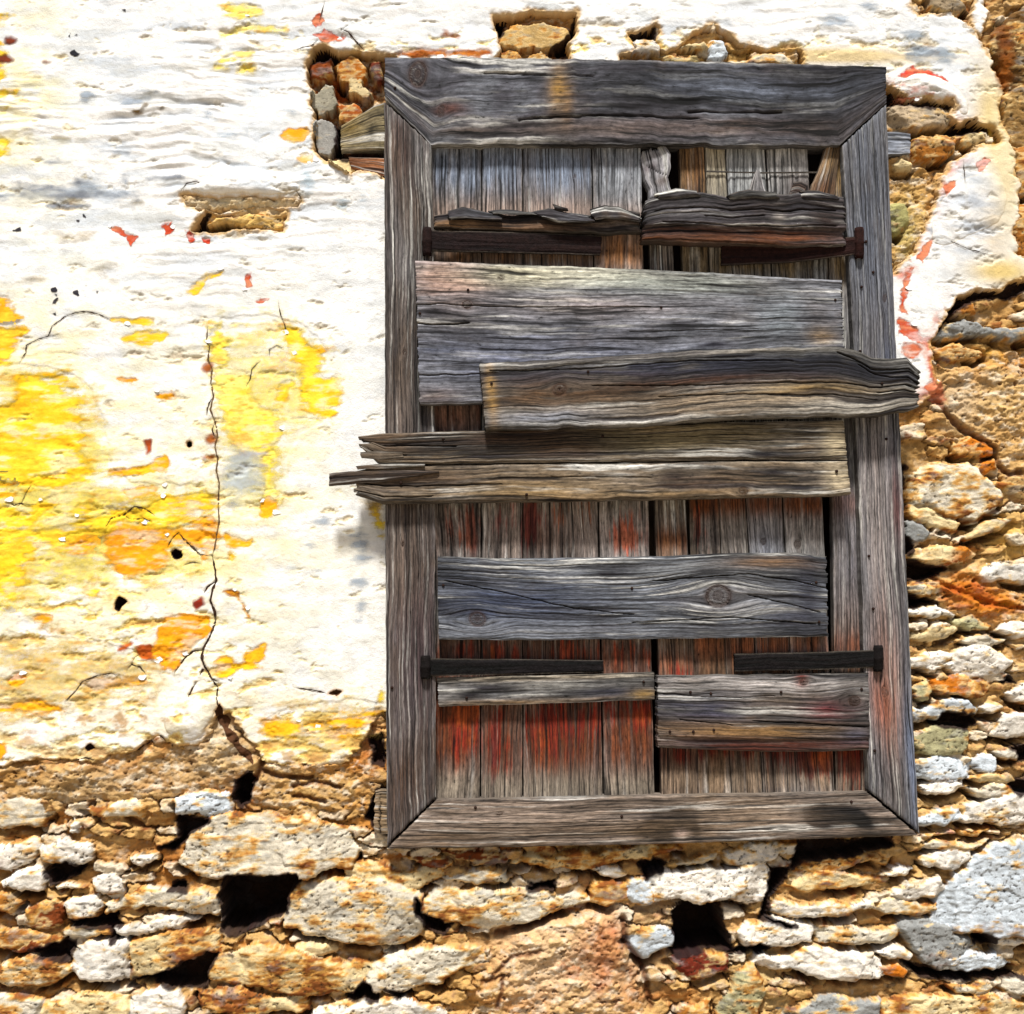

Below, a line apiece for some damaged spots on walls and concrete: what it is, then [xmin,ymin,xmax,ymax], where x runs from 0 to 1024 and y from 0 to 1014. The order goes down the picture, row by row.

spalling [399,15,575,60]
spalling [620,23,802,64]
spalling [280,13,385,174]
spalling [882,0,1024,272]
spalling [182,195,301,244]
crack [21,311,108,360]
spalling [0,266,1024,1014]